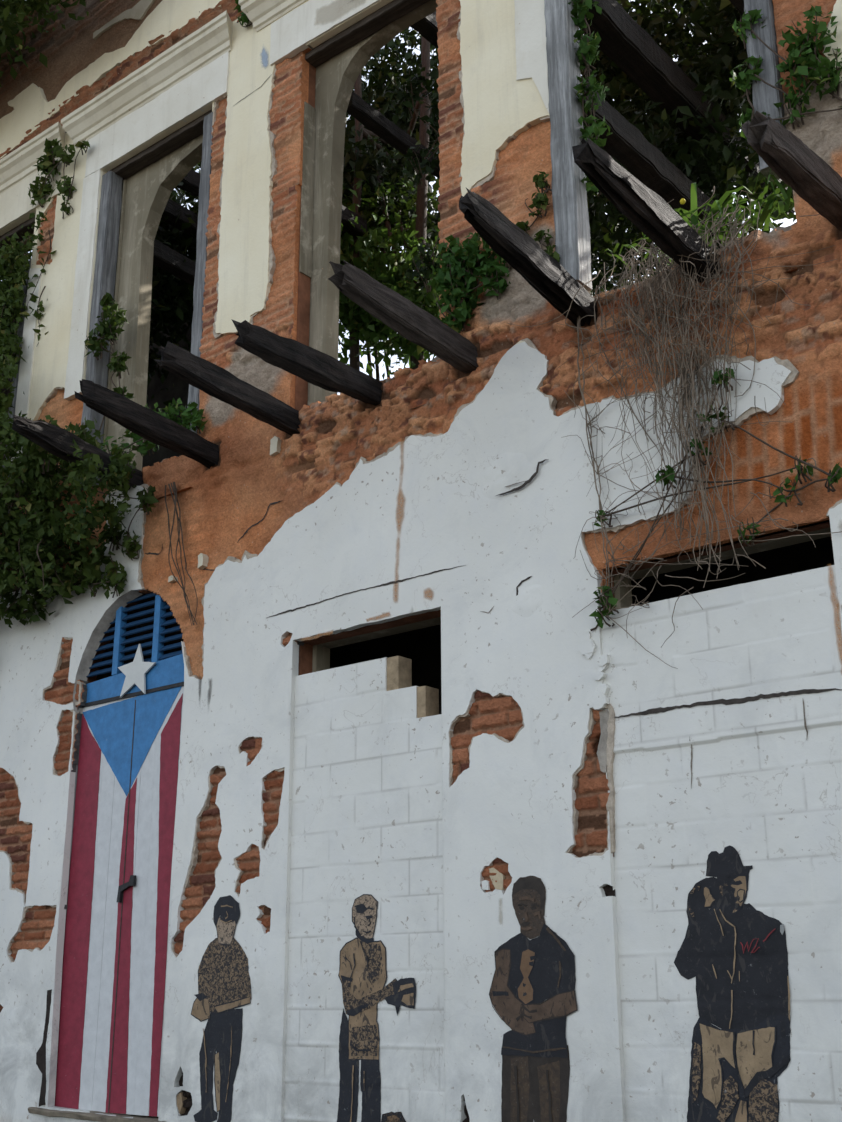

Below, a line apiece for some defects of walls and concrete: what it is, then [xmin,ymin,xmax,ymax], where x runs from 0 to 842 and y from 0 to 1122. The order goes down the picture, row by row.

flaking render [0,0,243,158]
flaking render [138,0,842,680]
crack [267,565,465,618]
flaking render [44,637,90,776]
flaking render [451,690,523,785]
flaking render [571,631,614,857]
crack [615,688,842,736]
flaking render [0,768,33,893]
flaking render [10,905,68,961]
flaking render [174,767,226,955]
flaking render [236,771,284,893]
spalling [481,858,512,892]